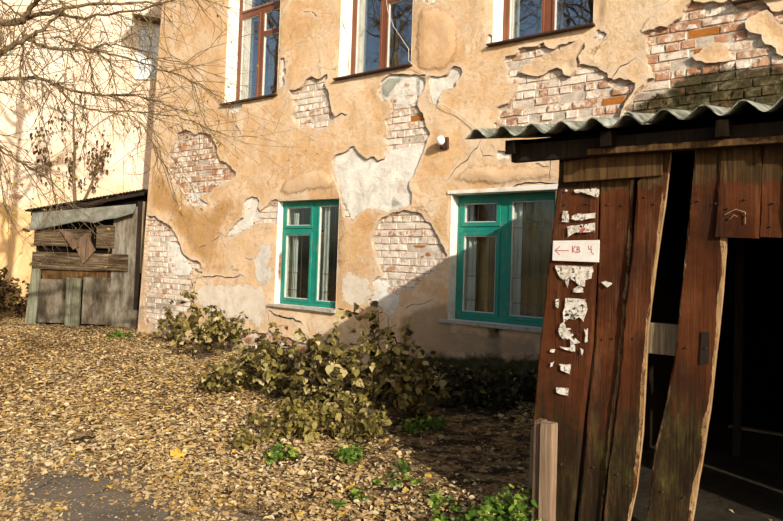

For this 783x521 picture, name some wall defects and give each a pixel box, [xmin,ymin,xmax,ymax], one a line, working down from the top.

flaking render [279,57,336,130]
flaking render [493,0,783,127]
damp [632,64,783,114]
flaking render [168,129,236,207]
flaking render [225,196,279,239]
flaking render [331,66,463,317]
crack [447,140,491,180]
crack [197,232,249,279]
flaking render [142,214,313,359]
crack [267,310,303,327]